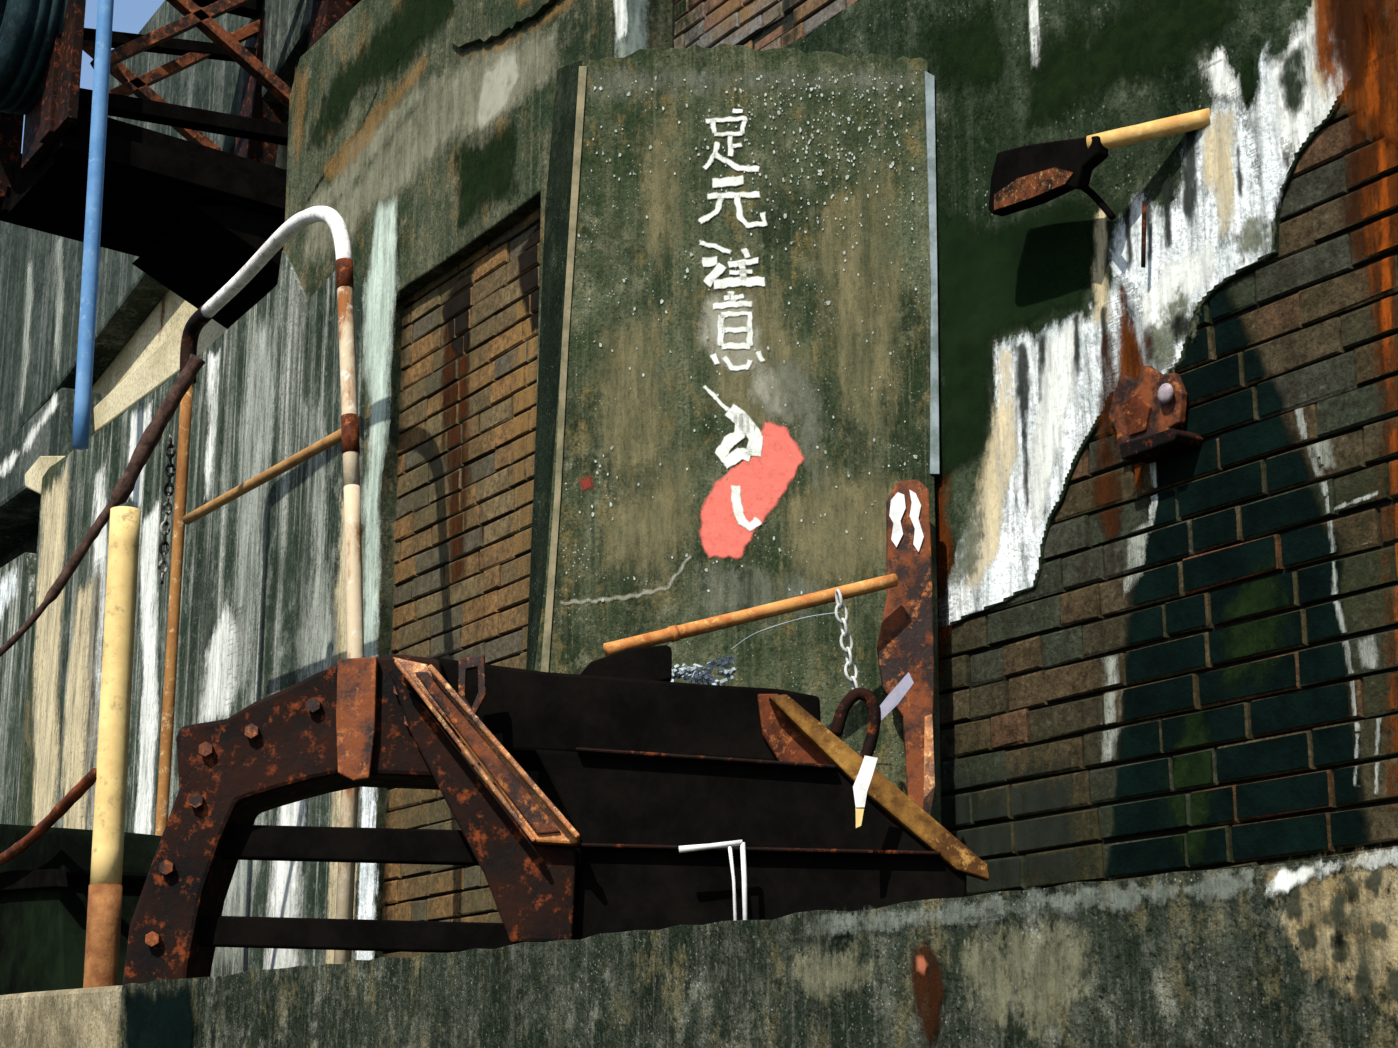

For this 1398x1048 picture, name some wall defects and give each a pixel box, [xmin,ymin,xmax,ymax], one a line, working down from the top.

damp [33,466,107,830]
damp [128,404,159,835]
damp [201,316,277,723]
damp [222,860,298,918]
damp [253,799,306,826]
damp [353,863,378,920]
damp [363,204,396,658]
flaking render [306,1,571,261]
peeling [1122,394,1152,436]
damp [938,0,1347,628]
corrosion [1315,0,1398,550]
corrosion [1383,569,1398,805]